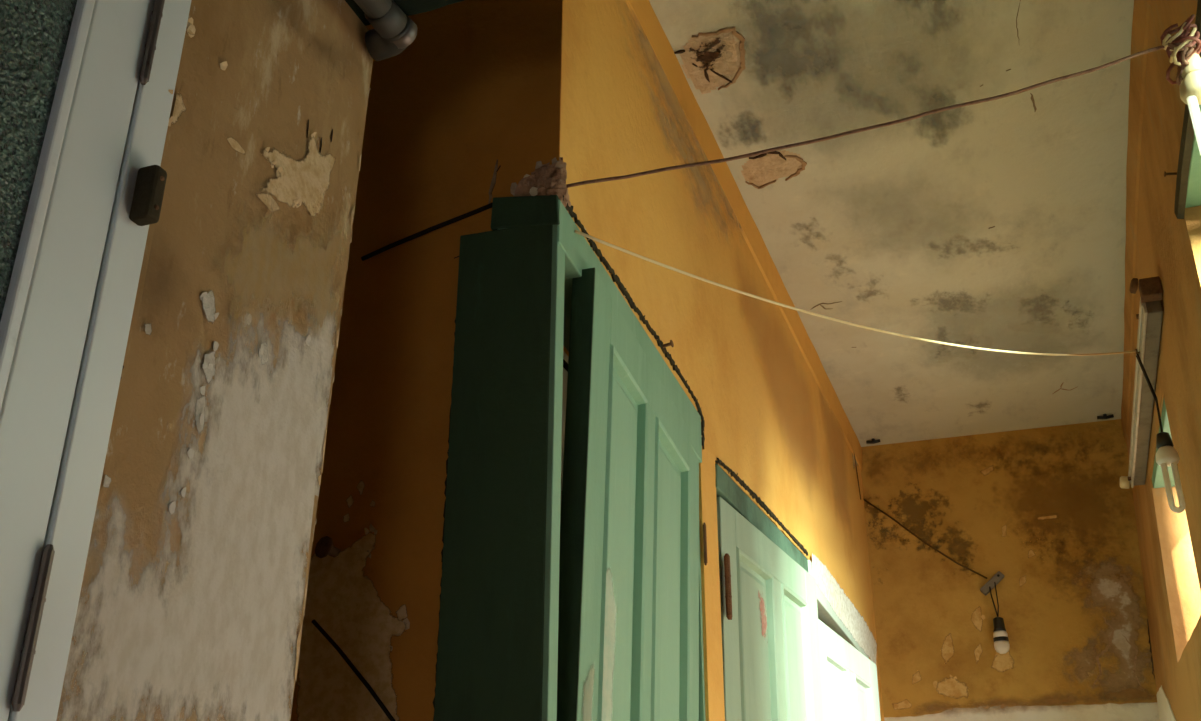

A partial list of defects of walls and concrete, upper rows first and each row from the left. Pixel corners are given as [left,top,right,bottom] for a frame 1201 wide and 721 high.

flaking render [674,27,746,94]
leakage [751,0,890,113]
peeling [256,132,335,217]
leakage [740,116,761,142]
flaking render [741,150,807,189]
flaking render [510,157,705,450]
peeling [62,290,410,721]
peeling [715,458,877,664]
leakage [865,487,973,571]
peeling [912,633,968,699]
leakage [1064,559,1151,694]